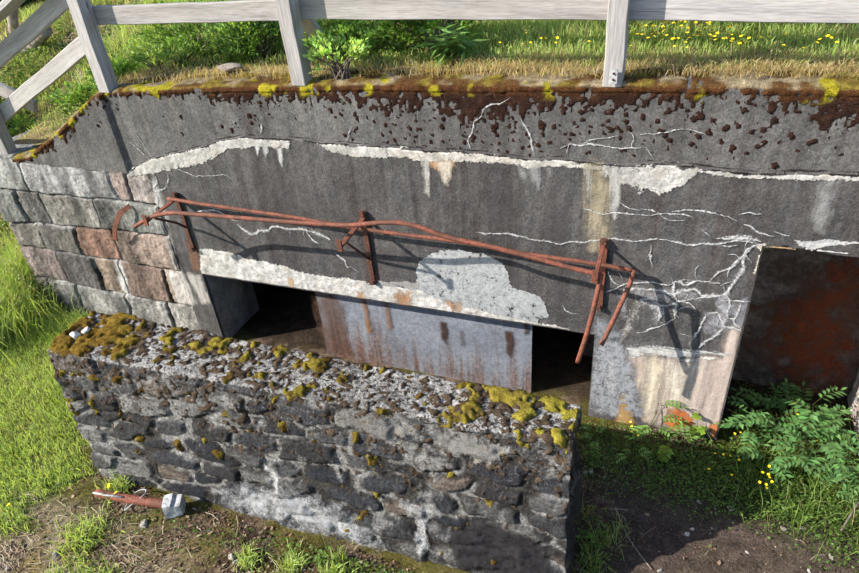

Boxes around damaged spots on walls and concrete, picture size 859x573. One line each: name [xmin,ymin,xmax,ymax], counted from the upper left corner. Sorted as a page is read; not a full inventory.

spalling [127,138,290,177]
crack [129,98,859,205]
spalling [317,143,859,196]
crack [197,209,358,272]
corrosion [316,292,344,350]
corrosion [357,291,371,333]
peeling [199,248,569,330]
corrosion [385,292,410,329]
corrosion [505,331,513,357]
crack [477,200,789,350]
leakage [589,290,748,430]
corrosion [665,405,694,430]